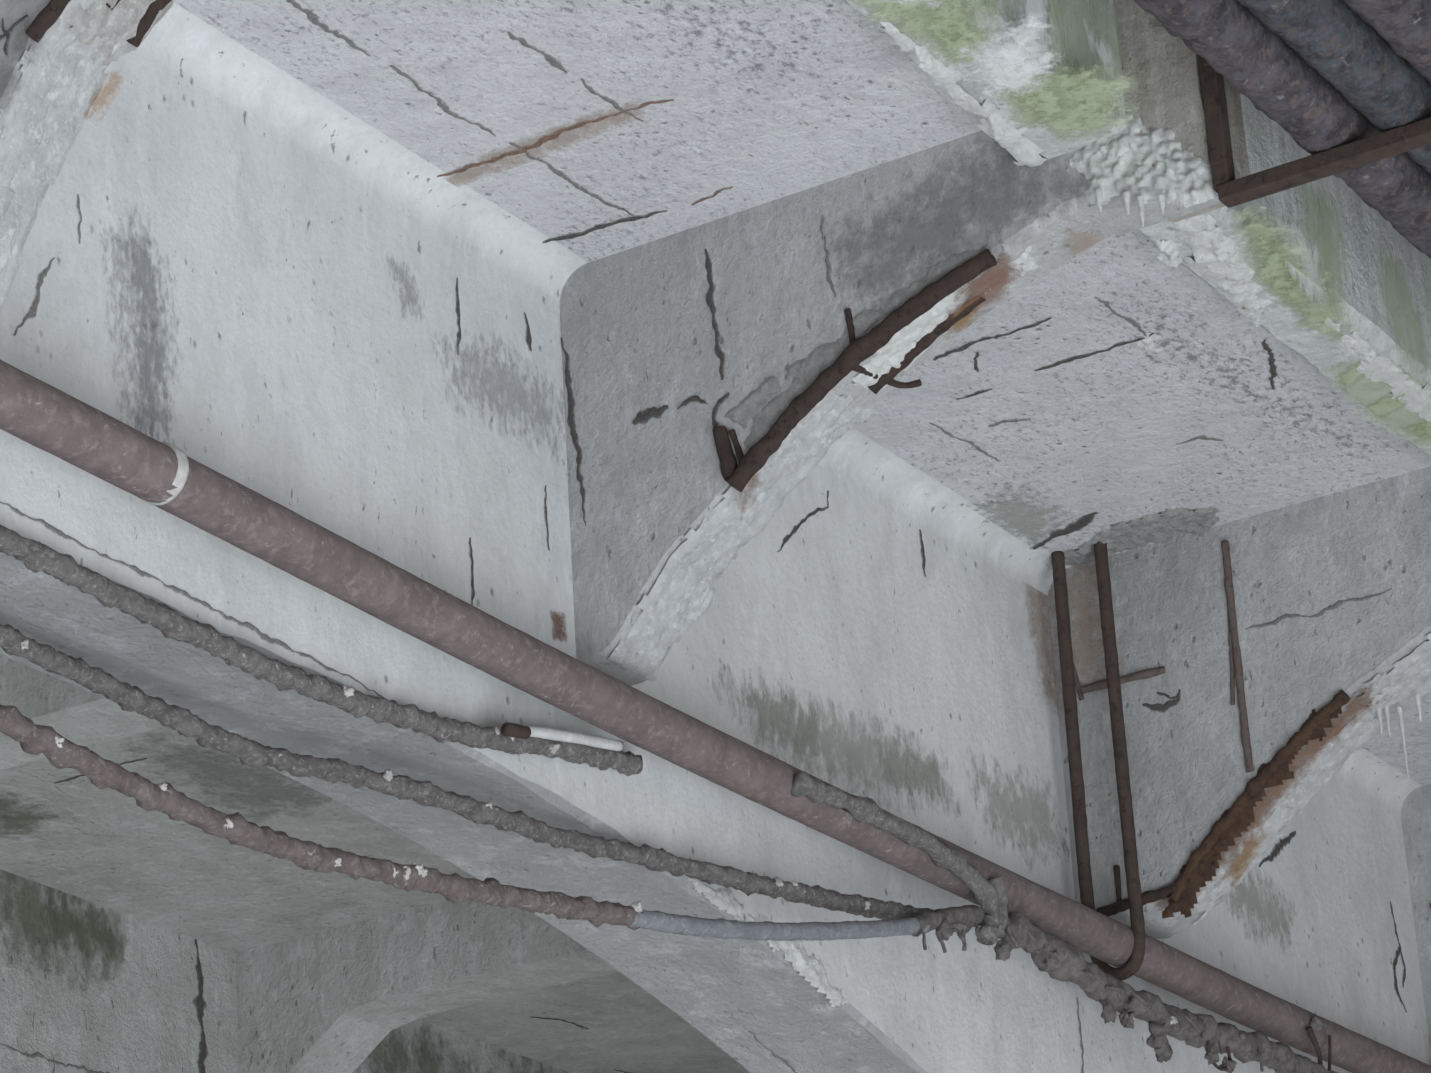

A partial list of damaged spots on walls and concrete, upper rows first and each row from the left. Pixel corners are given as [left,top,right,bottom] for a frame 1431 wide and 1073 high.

peeling [0,0,174,312]
crack [287,0,733,243]
water stain [660,0,794,93]
water stain [839,0,1323,327]
crack [524,312,586,551]
crack [632,249,730,429]
peeling [608,239,1039,682]
spalling [1064,507,1220,567]
water stain [1102,283,1431,457]
peeling [1096,540,1431,925]
corrosion [1218,690,1370,880]
crack [193,939,207,1073]